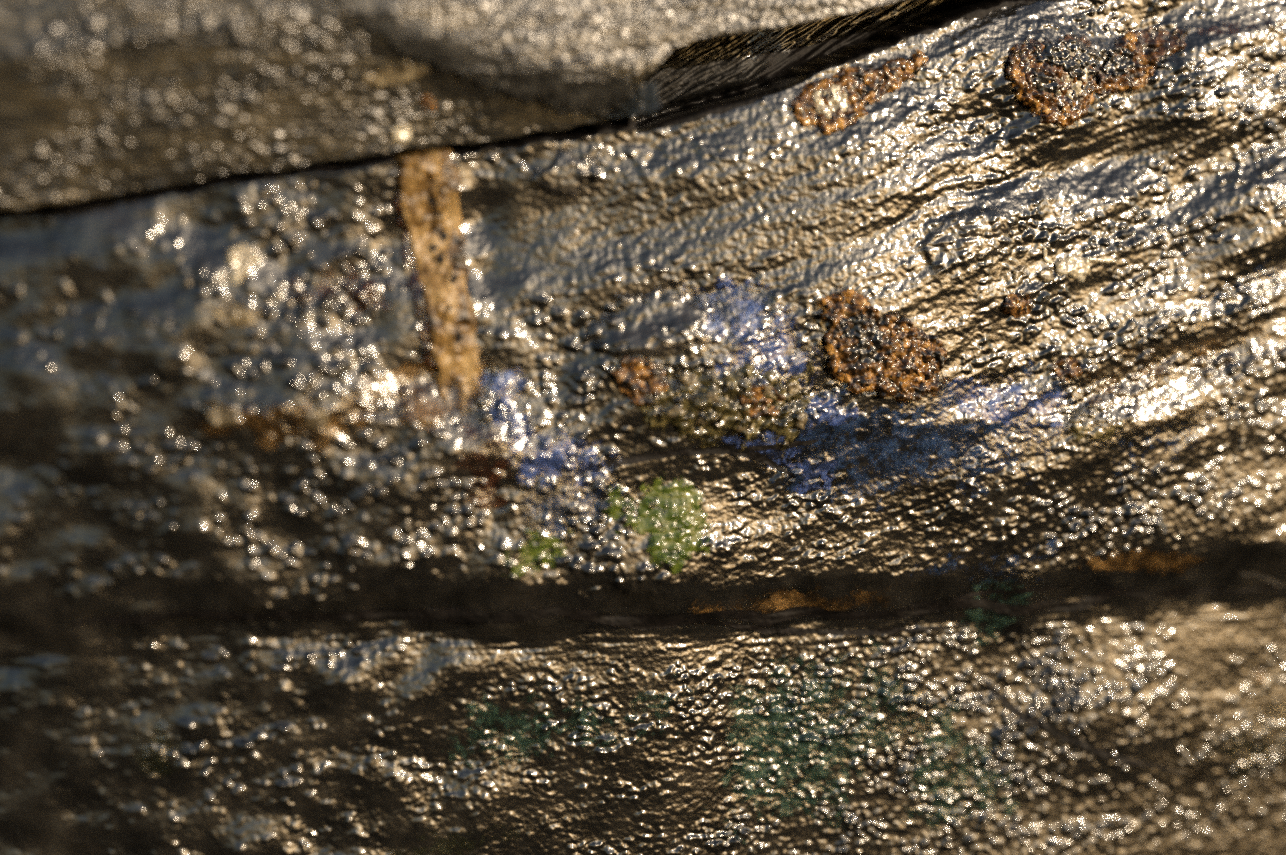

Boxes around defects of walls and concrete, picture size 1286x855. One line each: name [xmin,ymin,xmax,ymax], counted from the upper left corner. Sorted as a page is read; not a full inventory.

crack [58,0,1062,214]
rust [792,49,928,135]
rust [1005,23,1240,128]
rust [192,147,508,509]
rust [611,356,668,407]
rust [738,384,786,420]
rust [818,287,951,403]
damp [479,370,711,578]